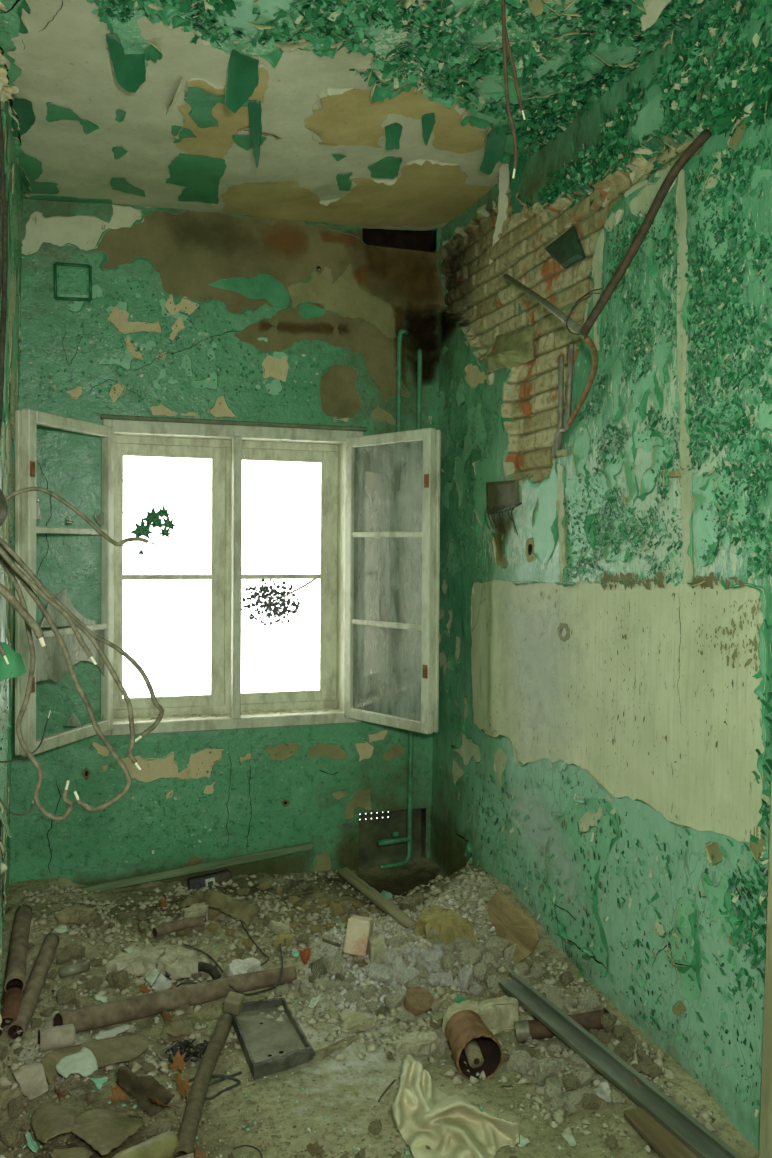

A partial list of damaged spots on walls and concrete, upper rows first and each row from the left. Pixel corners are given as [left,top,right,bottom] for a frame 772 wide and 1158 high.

leakage [261,322,348,333]
leakage [360,238,438,383]
peeling [92,729,404,868]
peeling [439,597,772,1117]
peeling [25,1132,39,1153]